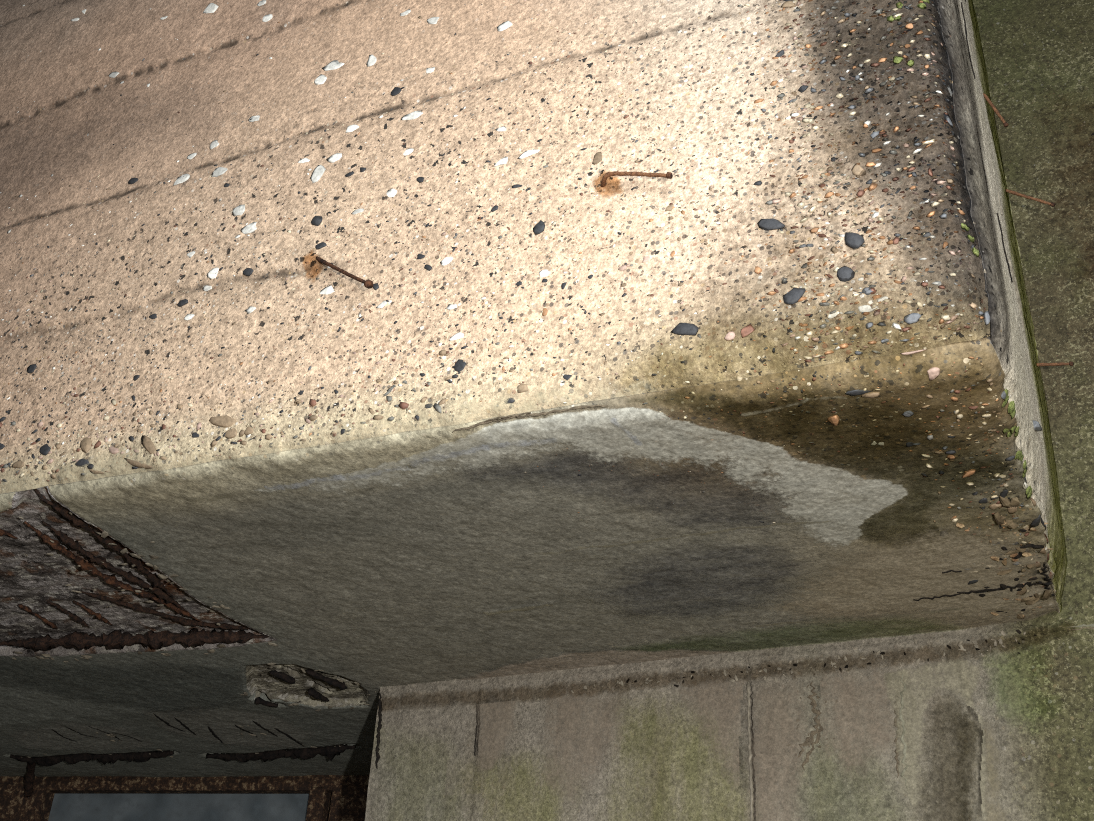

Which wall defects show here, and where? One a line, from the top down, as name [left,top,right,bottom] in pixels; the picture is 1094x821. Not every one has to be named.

spalling [0,0,1055,666]
damp [2,453,168,493]
damp [258,393,907,547]
spalling [240,663,377,711]
rust [10,749,174,767]
rust [206,744,356,762]
damp [825,660,998,821]